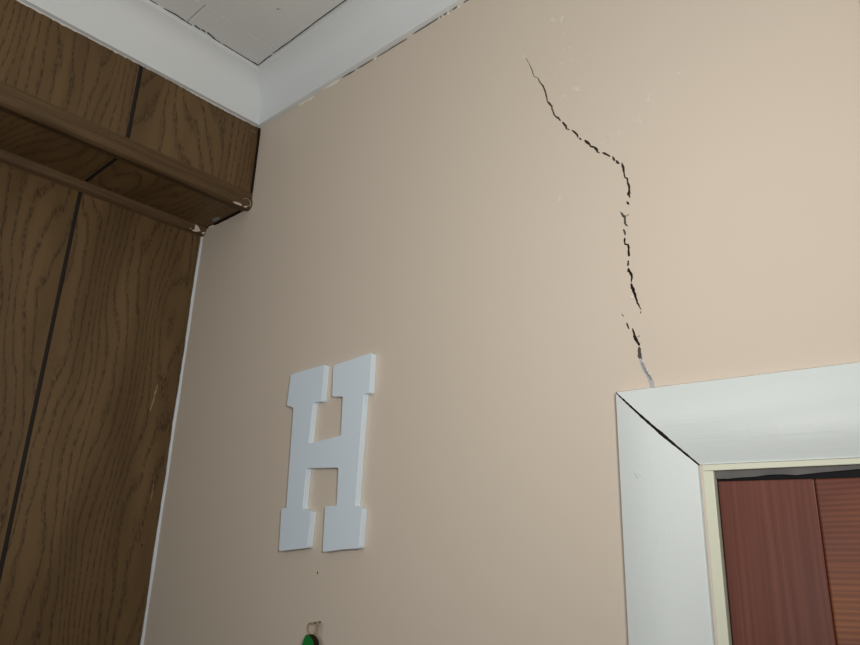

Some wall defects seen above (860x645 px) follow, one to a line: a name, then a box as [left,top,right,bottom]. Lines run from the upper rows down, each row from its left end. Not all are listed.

crack [526,58,655,388]
crack [616,393,700,466]